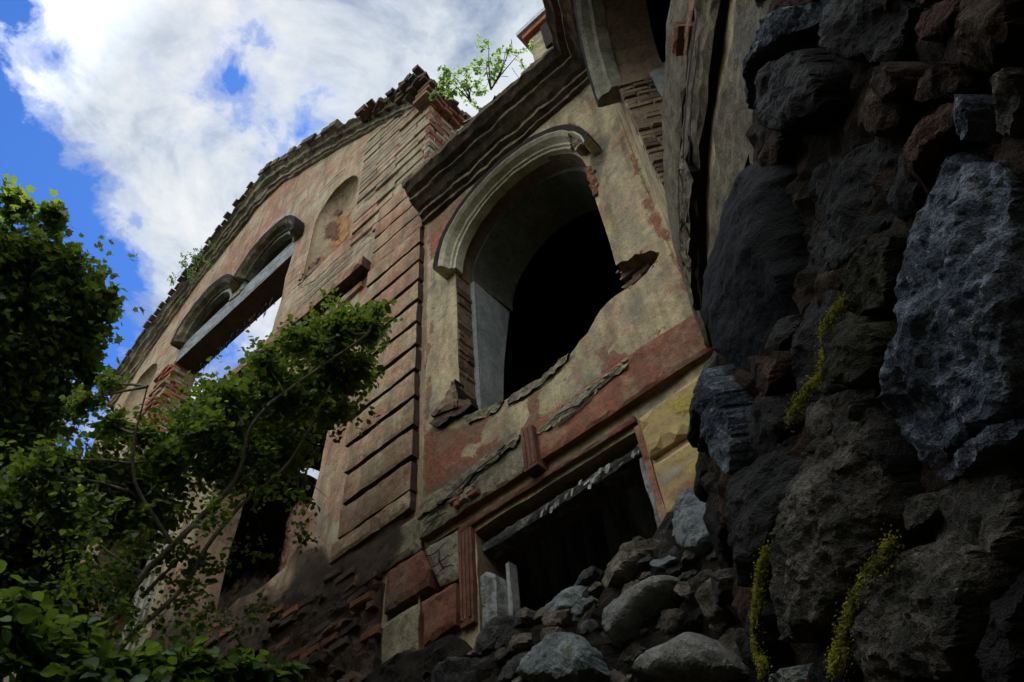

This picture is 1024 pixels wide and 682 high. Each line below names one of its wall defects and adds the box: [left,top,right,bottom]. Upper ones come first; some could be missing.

flaking render [322,93,500,246]
spalling [566,122,599,197]
spalling [616,136,700,311]
flaking render [136,361,189,435]
peeling [417,343,628,524]
crack [419,510,454,578]